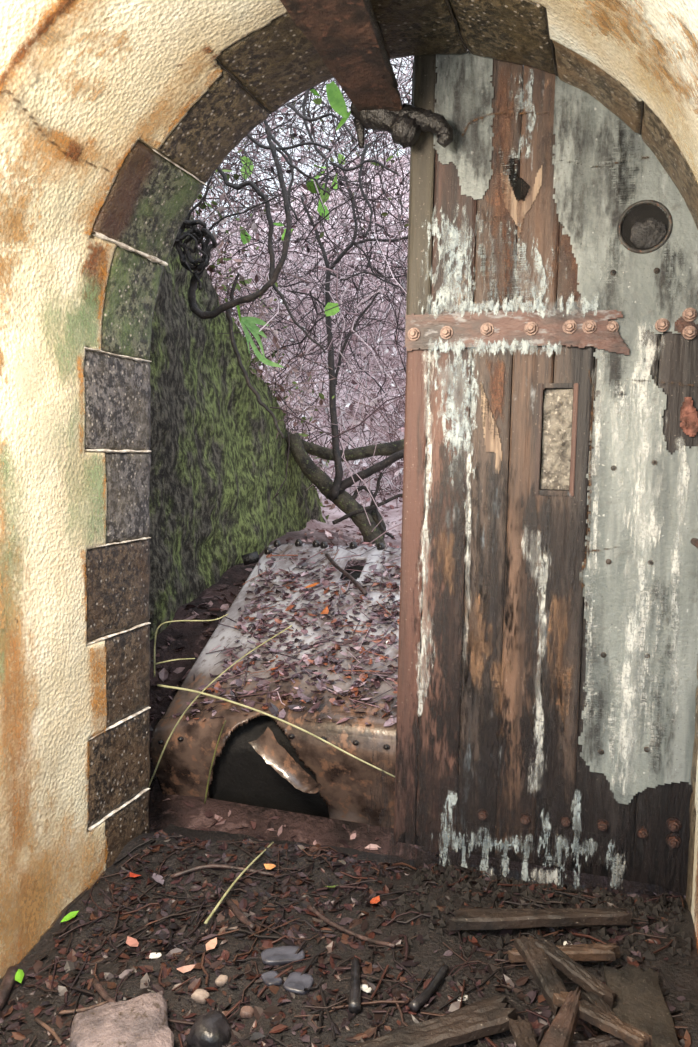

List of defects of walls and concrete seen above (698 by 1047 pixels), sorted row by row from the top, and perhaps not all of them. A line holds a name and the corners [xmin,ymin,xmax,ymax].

rust [0,0,91,94]
flaking render [581,0,698,120]
rust [26,127,101,176]
peeling [498,74,536,181]
peeling [421,208,553,318]
peeling [560,294,598,316]
rust [680,397,698,437]
rust [0,489,107,978]